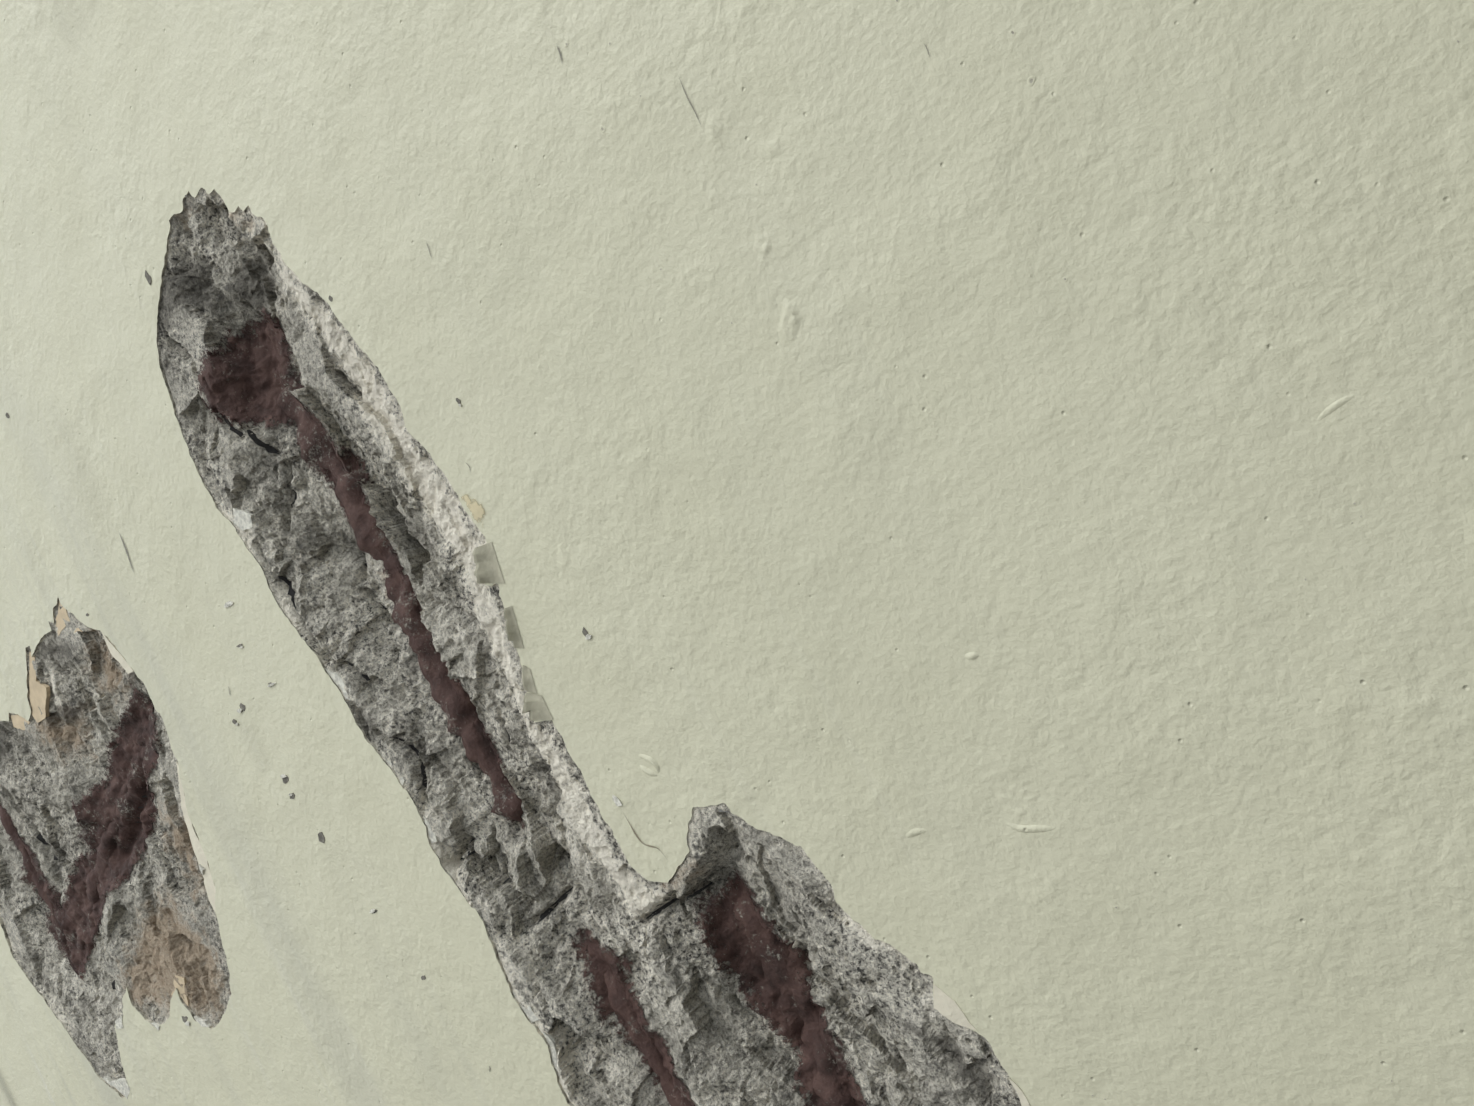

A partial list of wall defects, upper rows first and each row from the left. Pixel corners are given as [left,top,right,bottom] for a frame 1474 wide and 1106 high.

corrosion [197,307,374,526]
corrosion [0,680,164,981]
spalling [0,601,231,1099]
corrosion [447,668,525,829]
spalling [145,188,1030,1106]
corrosion [571,926,694,1106]
corrosion [692,867,870,1106]